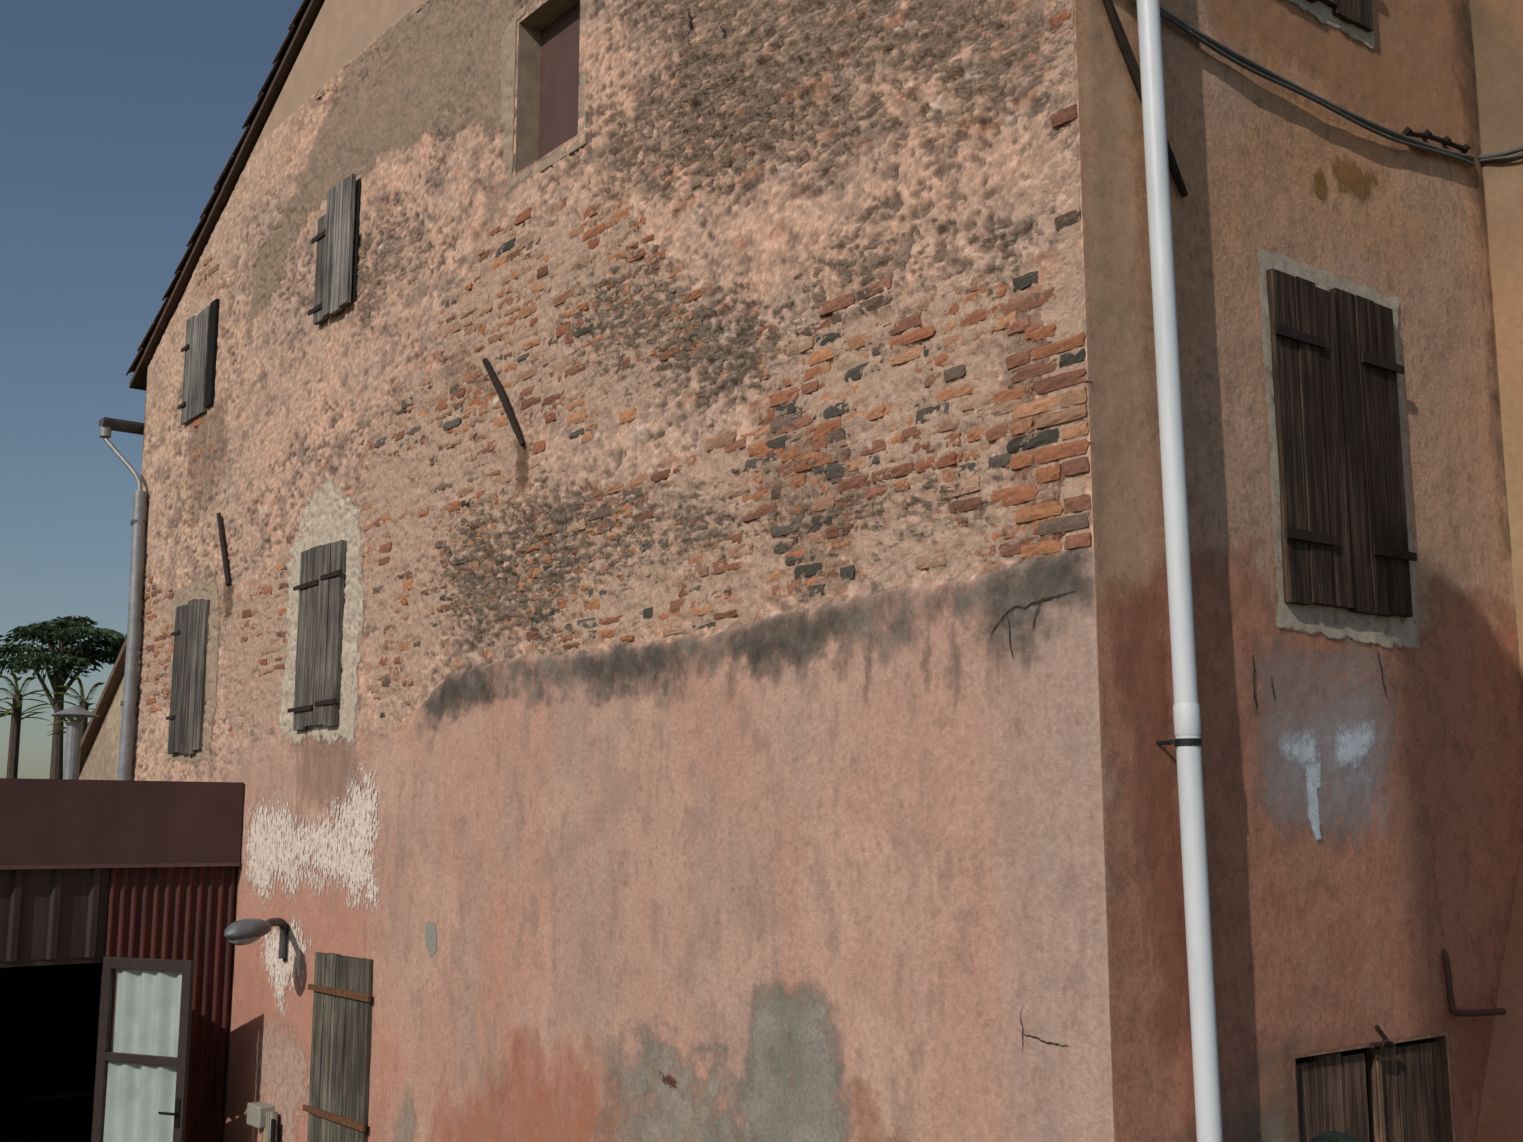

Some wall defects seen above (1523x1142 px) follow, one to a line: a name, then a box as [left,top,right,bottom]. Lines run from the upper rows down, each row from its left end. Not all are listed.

flaking render [248,0,521,316]
flaking render [341,0,1094,730]
damp [426,591,912,721]
damp [937,550,1089,640]
crack [989,590,1076,661]
flaking render [244,763,381,912]
flaking render [1097,574,1197,1142]
flaking render [1190,541,1523,1142]
flaking render [253,917,312,1142]
crack [1020,1007,1068,1047]
damp [1242,1085,1294,1142]